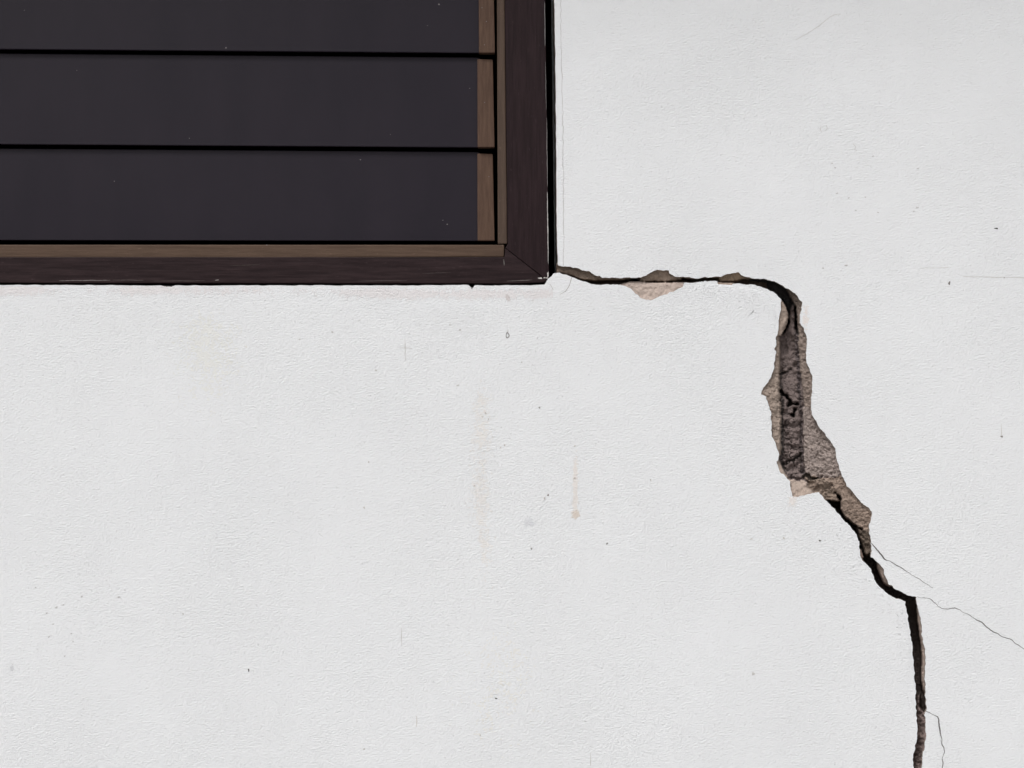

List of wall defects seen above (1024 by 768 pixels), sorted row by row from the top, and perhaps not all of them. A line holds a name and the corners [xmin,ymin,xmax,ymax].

peeling [620,270,684,300]
crack [551,2,1024,768]
spalling [761,289,892,588]